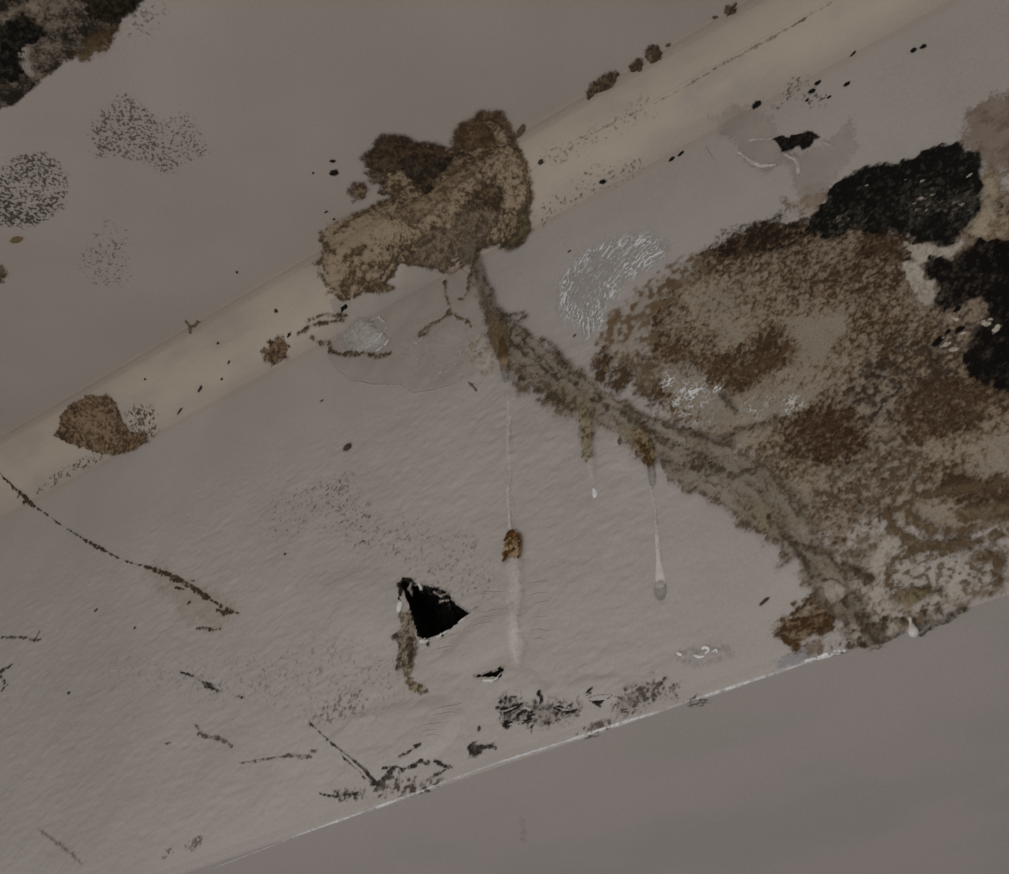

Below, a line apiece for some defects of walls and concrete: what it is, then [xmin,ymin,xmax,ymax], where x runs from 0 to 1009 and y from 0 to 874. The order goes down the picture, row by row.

damp [0,0,144,109]
peeling [721,105,857,197]
damp [260,93,1009,664]
spalling [129,405,156,443]
crack [2,476,239,632]
corrosion [502,530,521,562]
crack [195,722,452,798]
peeling [495,677,677,729]
peeling [583,720,611,739]